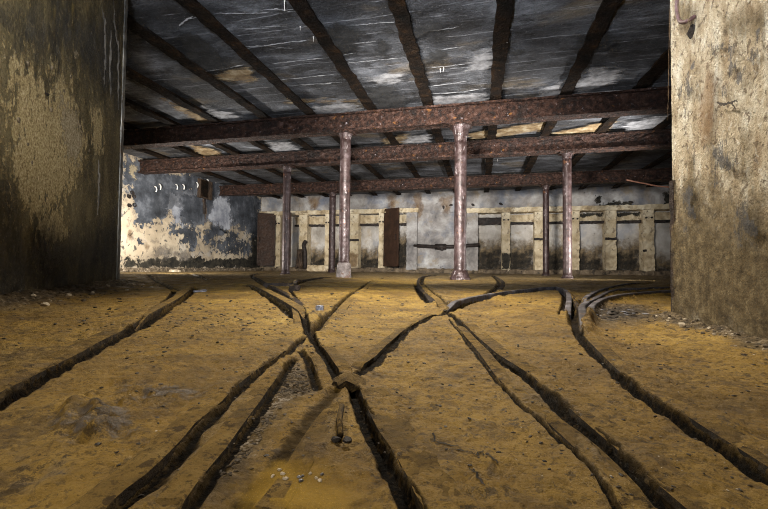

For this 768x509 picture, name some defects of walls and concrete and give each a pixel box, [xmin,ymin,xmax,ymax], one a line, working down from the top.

leakage [56,3,121,108]
leakage [466,48,493,71]
leakage [371,73,403,84]
rust [467,122,546,141]
peeling [122,153,262,258]
leakage [43,223,260,287]
leakage [478,239,533,270]
leakage [549,245,563,270]
leakage [579,245,603,270]
leakage [616,241,640,271]